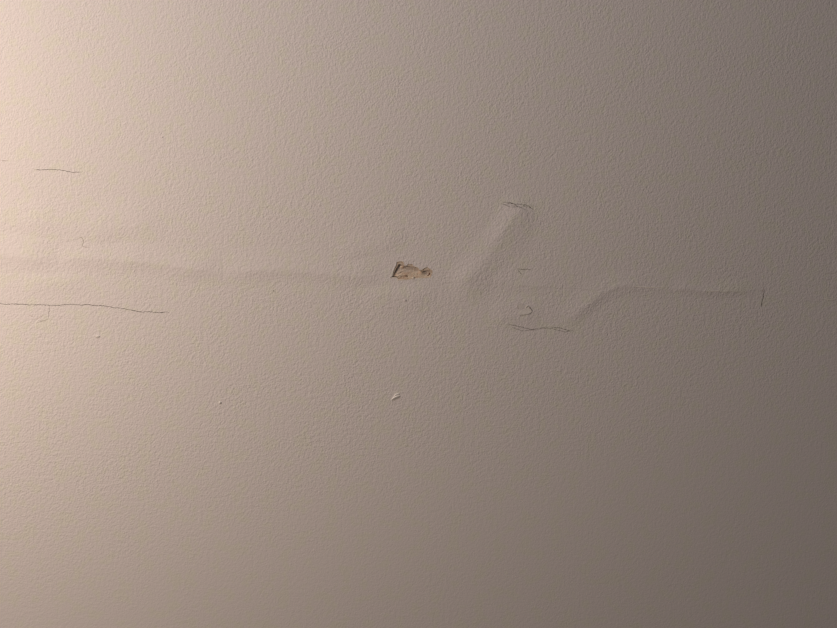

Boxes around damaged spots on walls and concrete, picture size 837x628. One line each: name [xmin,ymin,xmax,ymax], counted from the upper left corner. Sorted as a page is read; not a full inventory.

crack [4,304,163,322]